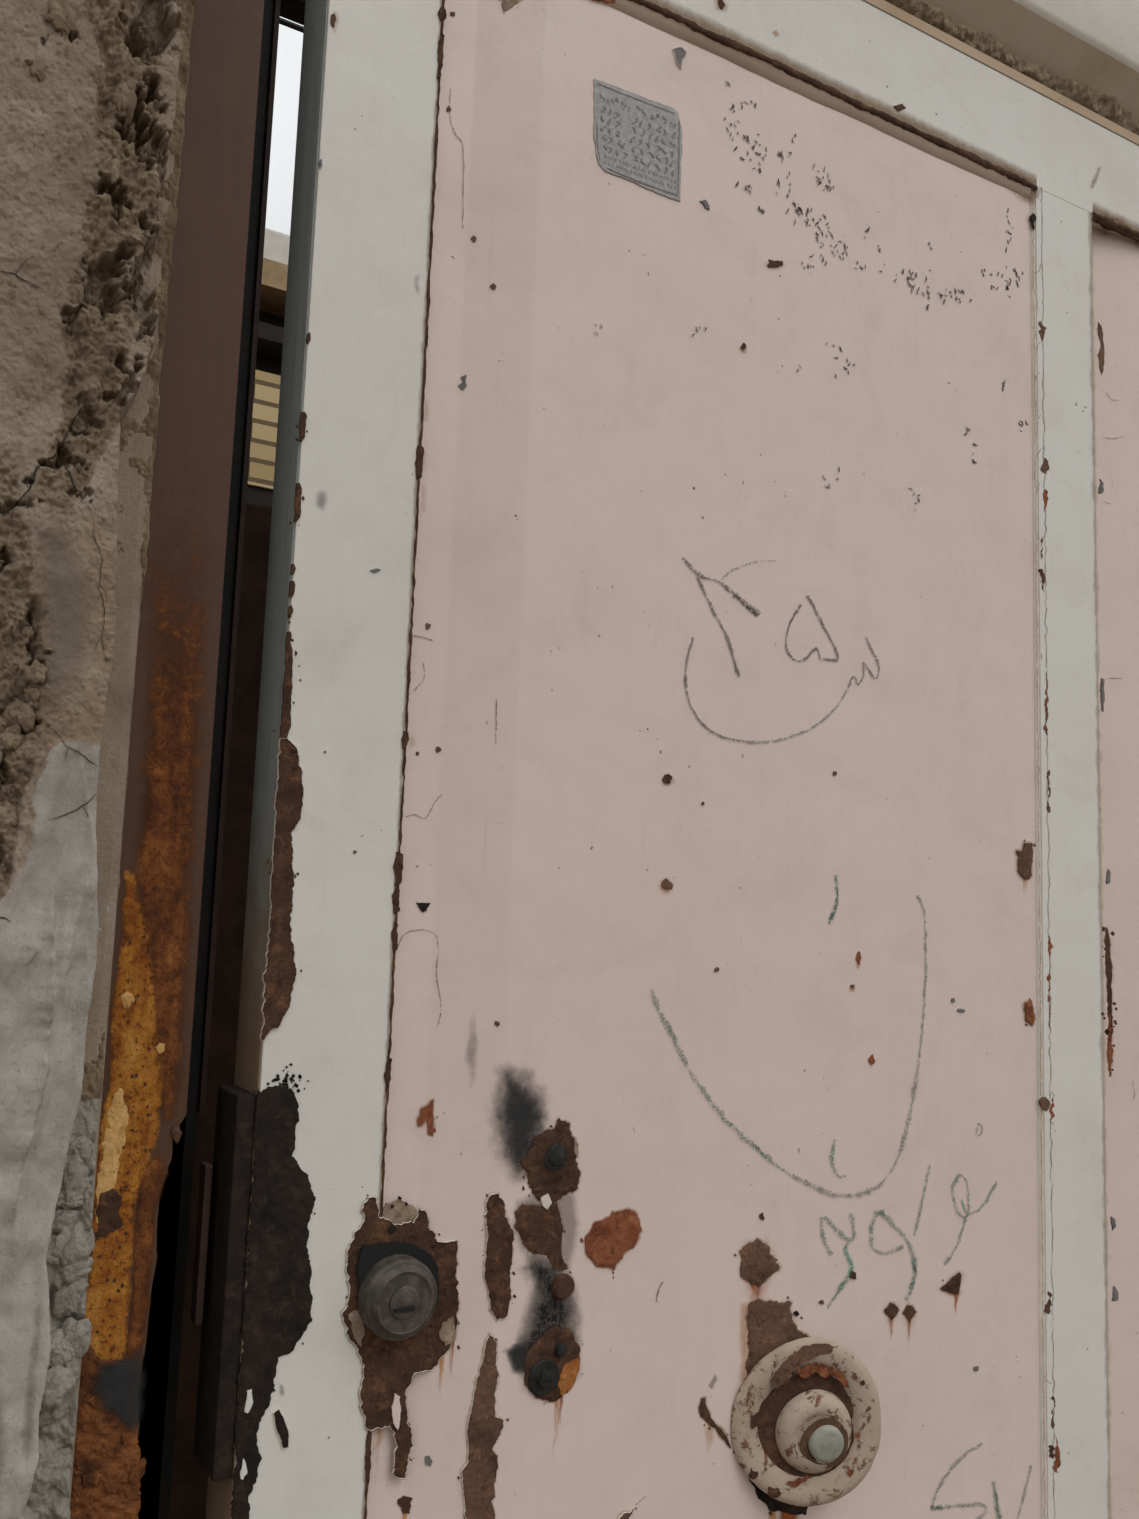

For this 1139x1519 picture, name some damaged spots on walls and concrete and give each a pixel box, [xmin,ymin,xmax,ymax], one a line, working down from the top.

spalling [0,0,163,901]
rust [70,587,203,1519]
rust [1016,839,1036,880]
rust [1101,927,1118,1077]
peeling [231,1063,316,1519]
rust [341,1194,460,1519]
rust [457,1118,646,1519]
rust [751,1412,761,1429]
rust [748,1468,811,1519]
rust [734,1238,865,1392]